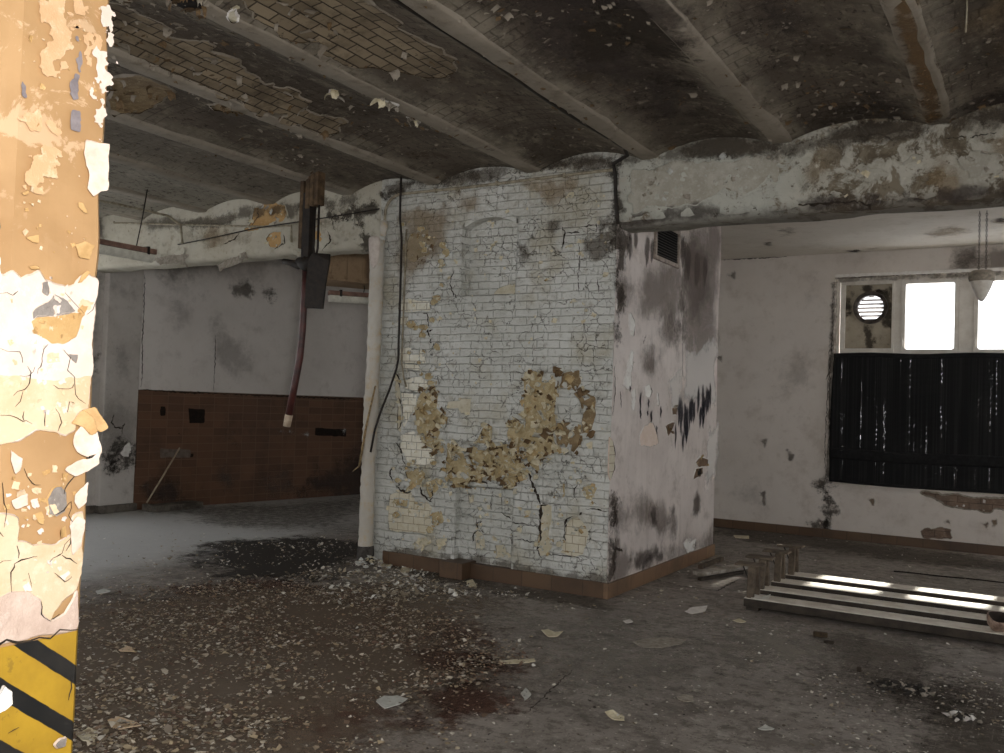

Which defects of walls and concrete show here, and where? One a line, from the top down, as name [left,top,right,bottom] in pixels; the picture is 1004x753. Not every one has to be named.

flaking render [477,0,650,46]
damp [570,0,702,63]
peeling [18,109,81,195]
damp [663,118,926,160]
crack [3,346,86,431]
peeling [0,258,99,445]
damp [102,436,136,476]
peeling [121,442,132,457]
peeling [387,346,599,552]
damp [629,371,718,481]
damp [807,283,883,529]
crack [472,456,622,576]